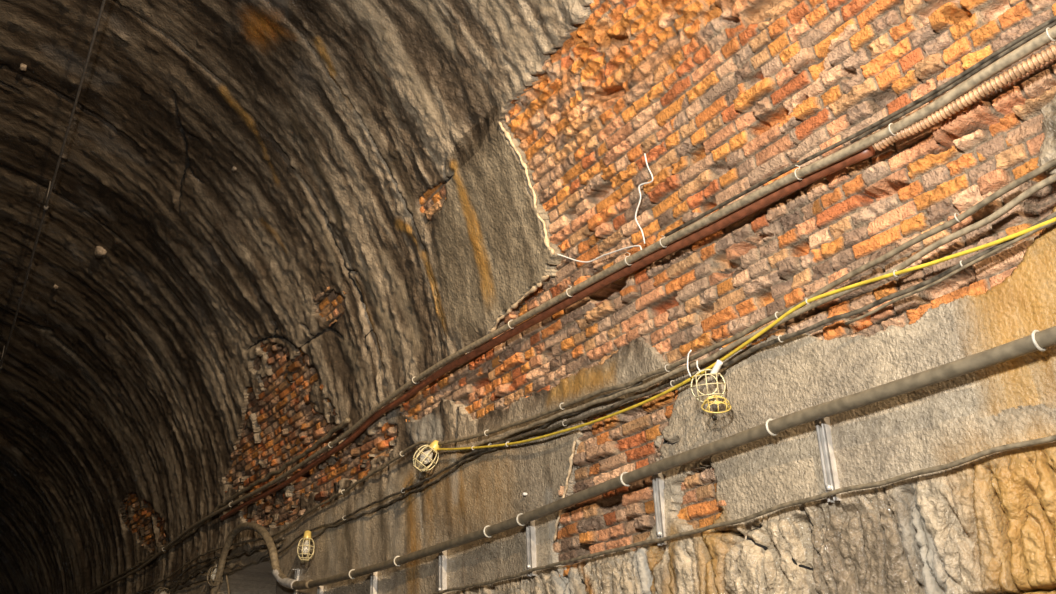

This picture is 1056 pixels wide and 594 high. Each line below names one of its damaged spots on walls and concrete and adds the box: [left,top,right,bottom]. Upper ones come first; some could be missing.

rust [451,162,491,291]
spalling [225,0,1056,530]
rust [978,250,1052,344]
rust [1005,356,1038,406]
spalling [122,493,168,551]
spalling [552,382,678,577]